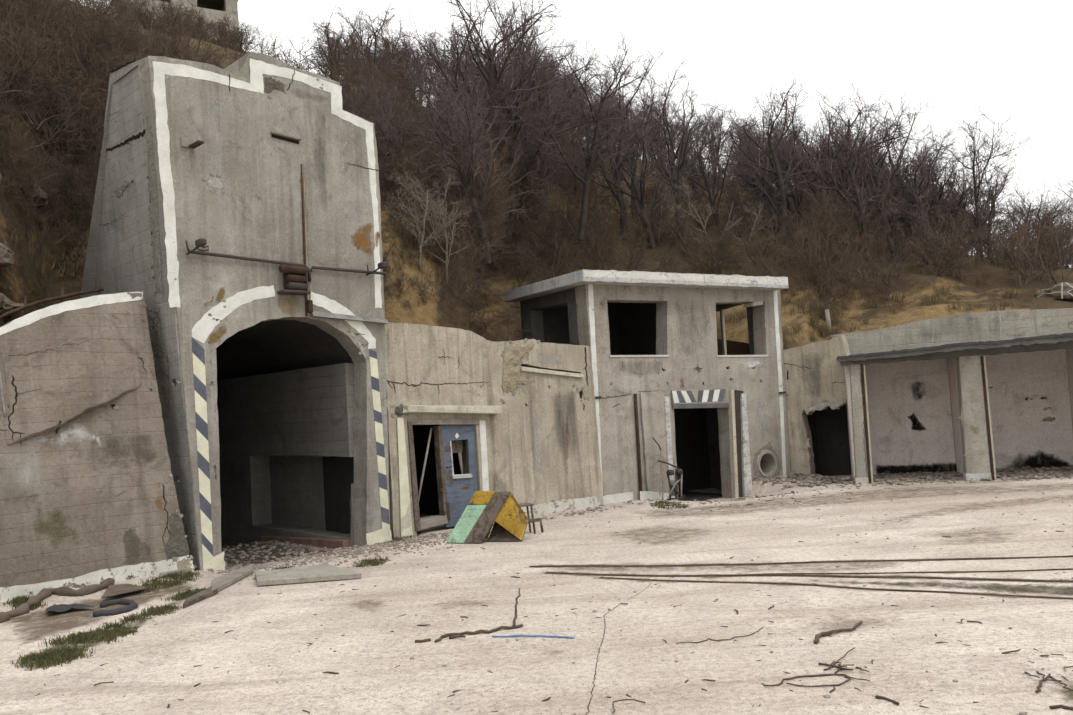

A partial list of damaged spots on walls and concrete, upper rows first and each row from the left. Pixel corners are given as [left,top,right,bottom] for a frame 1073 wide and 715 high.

corrosion [352,225,380,252]
corrosion [208,327,226,343]
crack [0,340,88,448]
spalling [500,338,540,406]